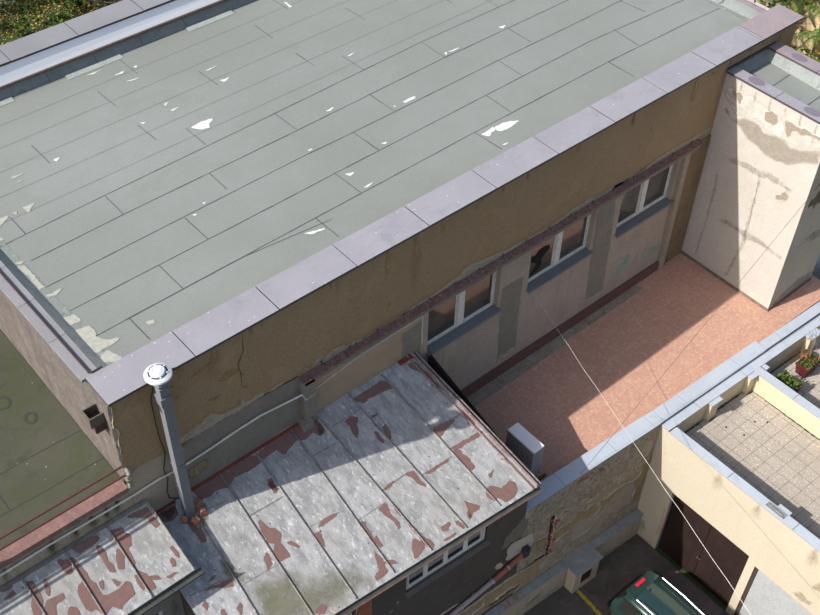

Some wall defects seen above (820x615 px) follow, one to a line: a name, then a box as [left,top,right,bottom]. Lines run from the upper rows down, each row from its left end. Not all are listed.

leakage [737,120,818,163]
spalling [409,128,711,311]
peeling [354,381,391,403]
peeling [345,416,359,438]
peeling [194,419,325,500]
peeling [27,527,179,615]
peeling [127,503,178,528]
peeling [206,566,237,591]
peeling [258,520,300,571]
peeling [314,513,337,547]
peeling [352,513,398,581]
spalling [440,443,653,615]